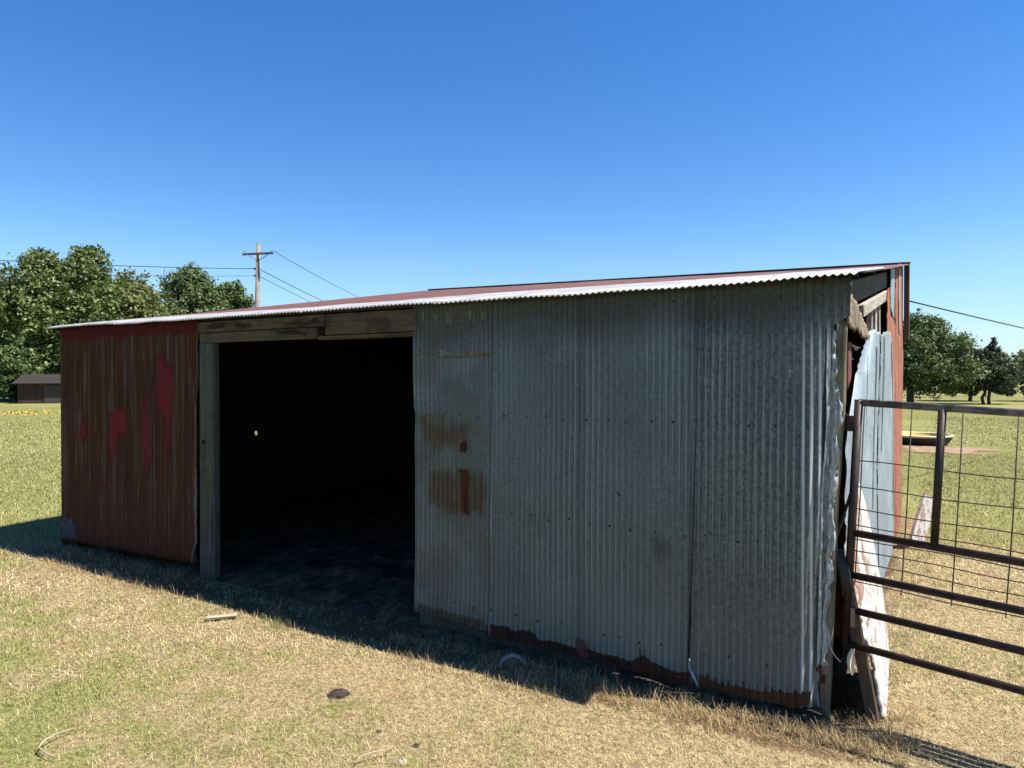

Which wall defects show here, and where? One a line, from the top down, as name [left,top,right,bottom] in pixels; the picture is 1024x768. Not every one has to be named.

corrosion [430,470,482,516]
corrosion [418,605,828,708]